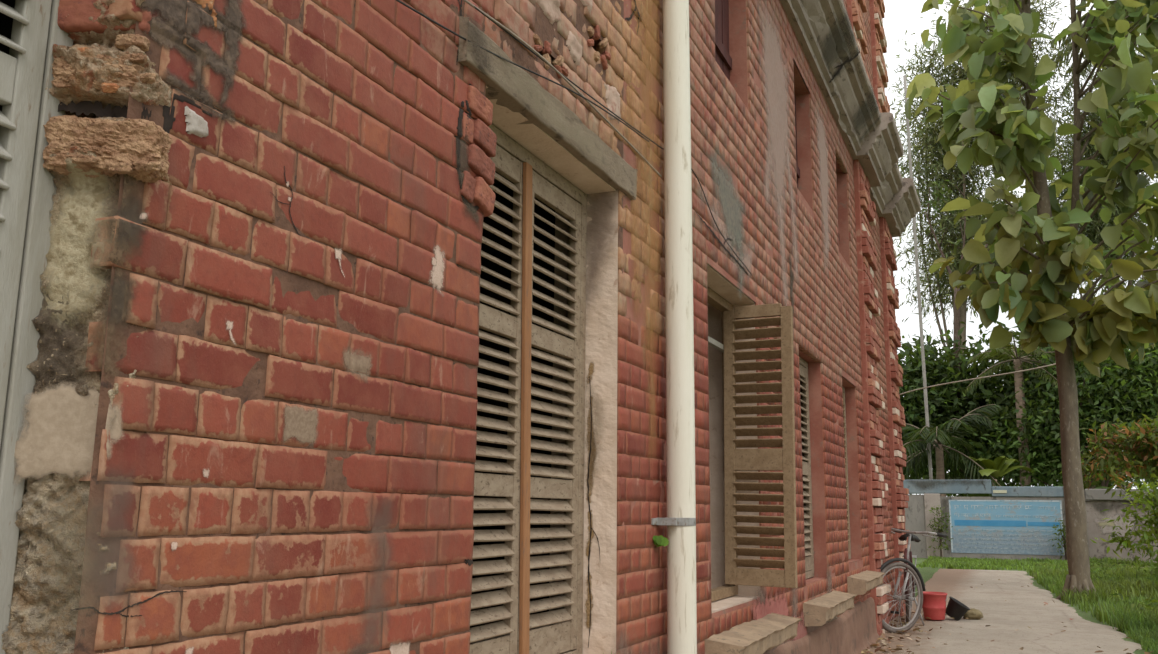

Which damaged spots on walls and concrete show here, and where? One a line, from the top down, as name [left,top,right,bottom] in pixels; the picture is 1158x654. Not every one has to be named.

spalling [57,0,156,94]
peeling [533,0,621,124]
spalling [43,115,173,183]
flaking render [14,383,123,480]
crack [587,376,600,647]